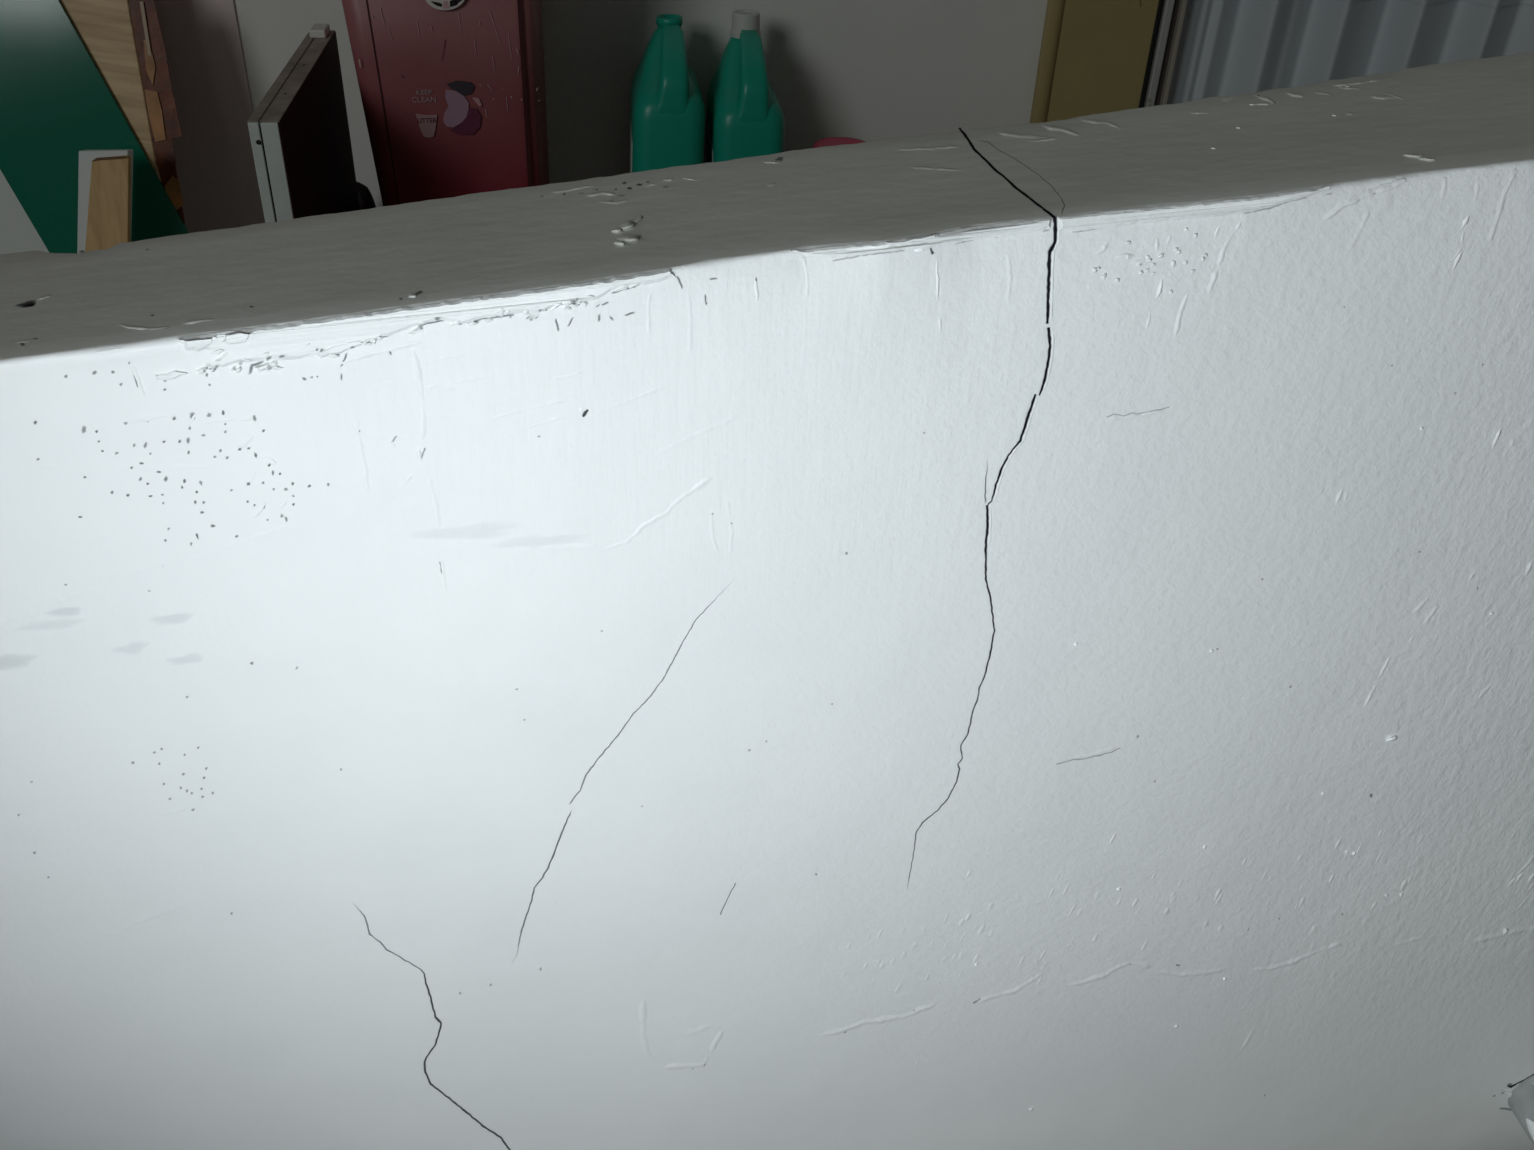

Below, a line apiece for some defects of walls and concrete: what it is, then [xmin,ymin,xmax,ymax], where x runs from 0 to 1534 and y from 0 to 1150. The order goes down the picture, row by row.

crack [909,127,1065,877]
crack [519,602,713,942]
crack [360,911,510,1150]